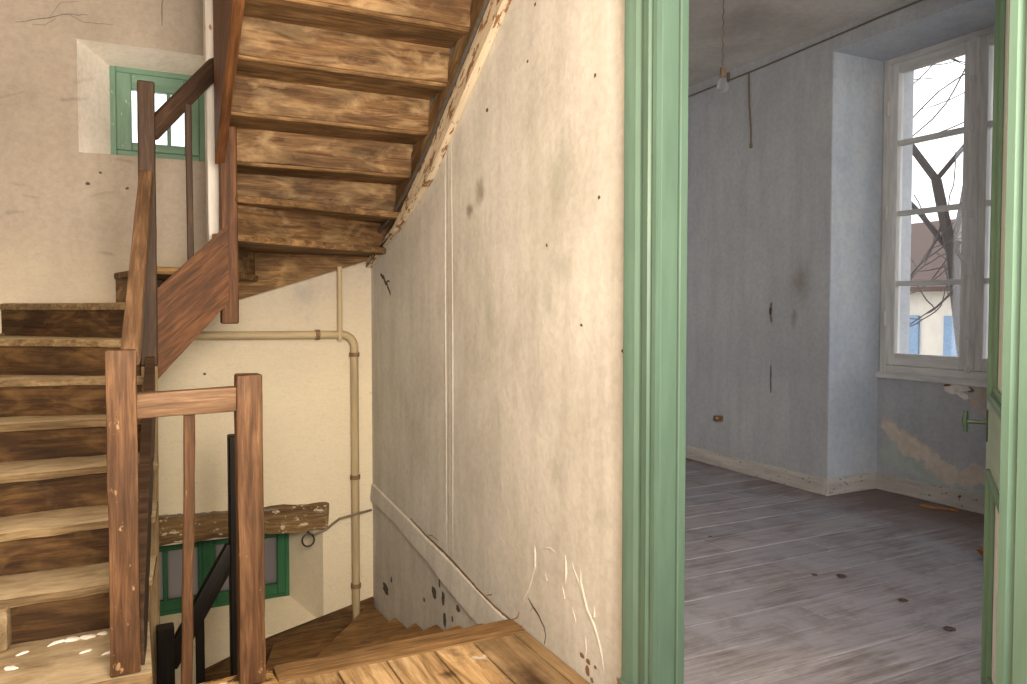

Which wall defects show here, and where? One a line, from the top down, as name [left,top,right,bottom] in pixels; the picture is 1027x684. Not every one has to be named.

crack [21,1,113,25]